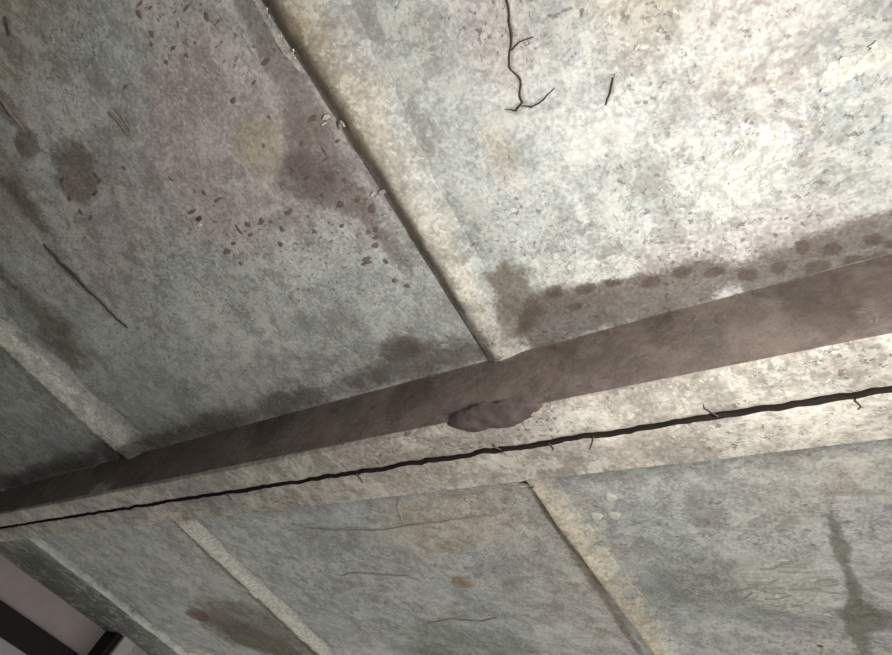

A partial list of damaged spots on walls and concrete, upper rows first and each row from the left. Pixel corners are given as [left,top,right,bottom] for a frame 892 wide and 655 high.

crack [505,0,554,112]
crack [42,244,128,328]
damp [0,213,892,512]
crack [0,386,892,532]